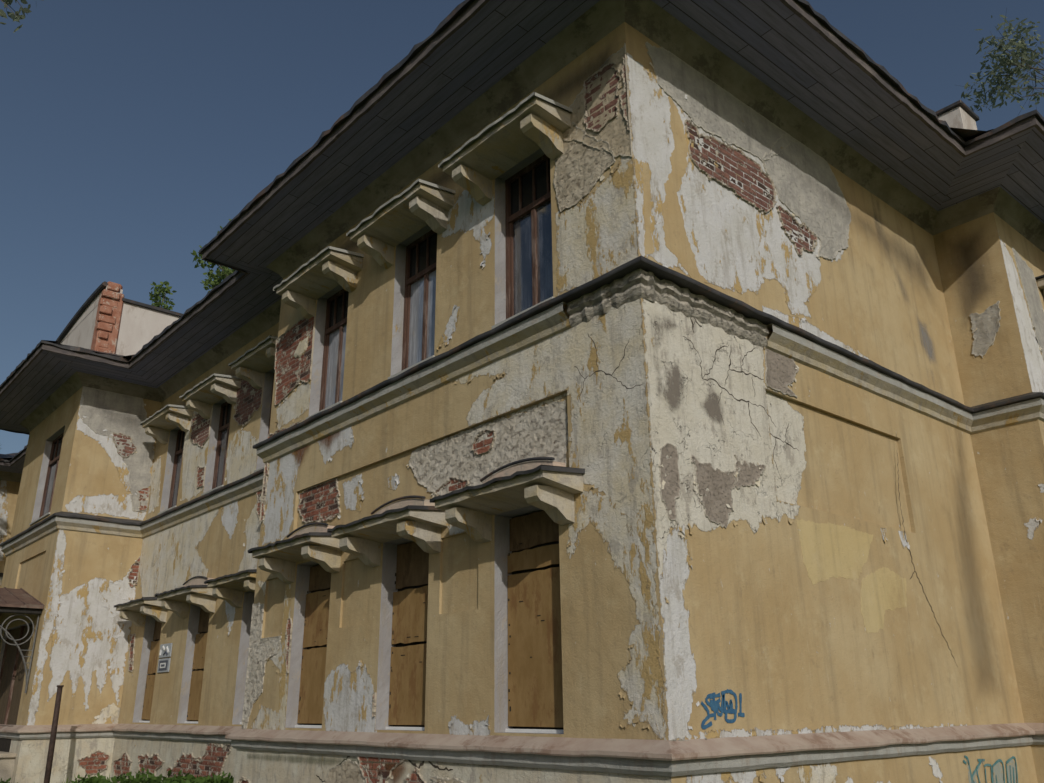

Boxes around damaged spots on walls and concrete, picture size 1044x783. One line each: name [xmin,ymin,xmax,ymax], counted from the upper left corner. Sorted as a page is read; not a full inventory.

peeling [553,41,874,362]
peeling [969,235,1044,393]
crack [683,317,799,479]
peeling [26,316,364,730]
peeling [388,298,968,741]
flaking render [77,743,232,781]
flaking render [323,756,465,783]
peeling [685,763,855,783]
peeling [929,756,944,783]